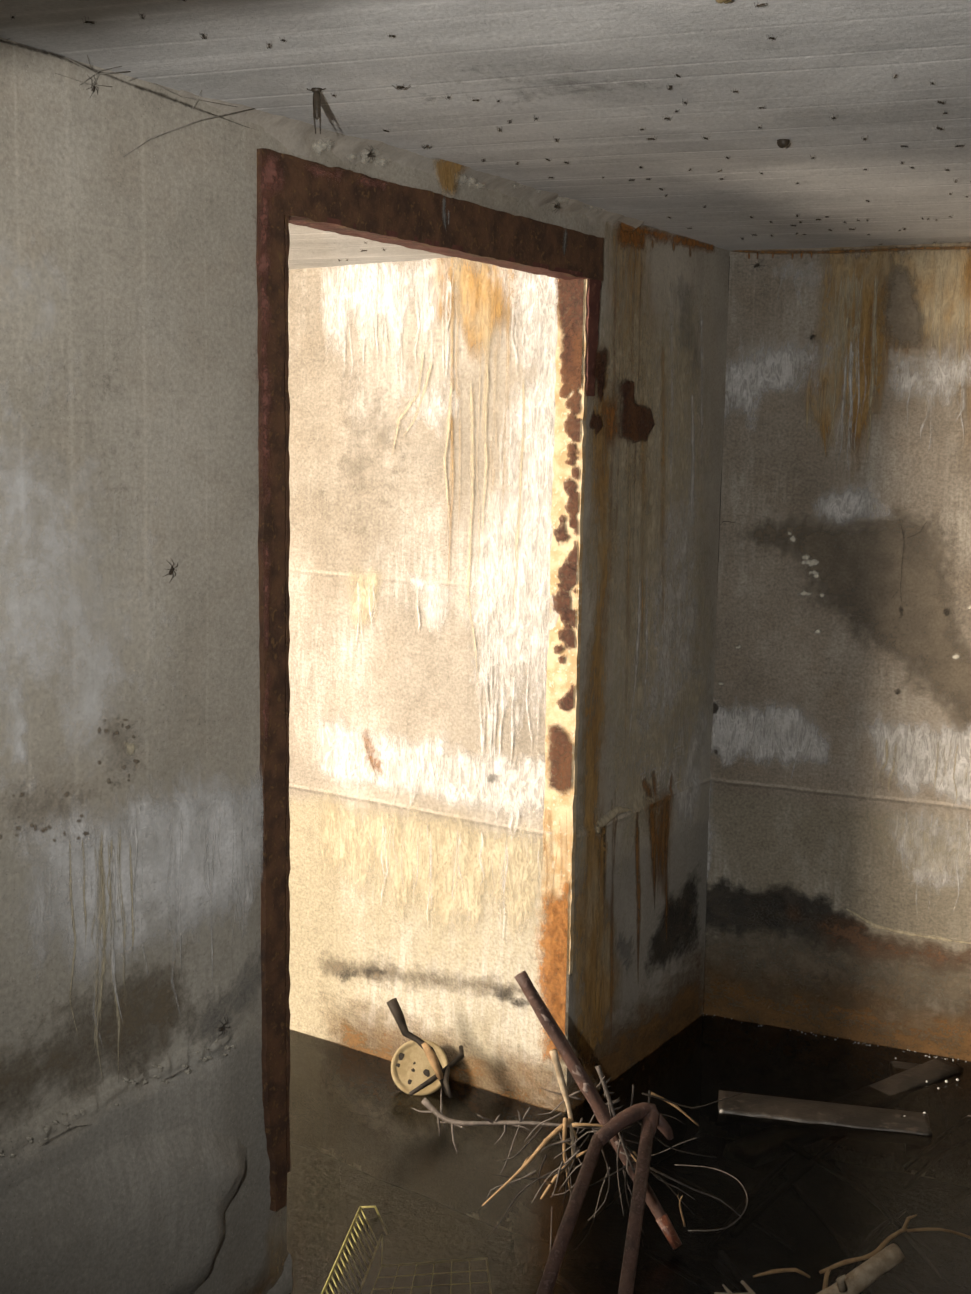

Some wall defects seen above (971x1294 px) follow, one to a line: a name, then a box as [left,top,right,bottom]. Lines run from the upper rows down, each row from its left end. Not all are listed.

rust [439,257,516,680]
rust [618,221,713,257]
rust [734,243,971,398]
rust [537,278,655,1063]
water stain [751,511,971,806]
water stain [0,783,261,1105]
water stain [324,817,971,1152]
rust [635,773,673,965]